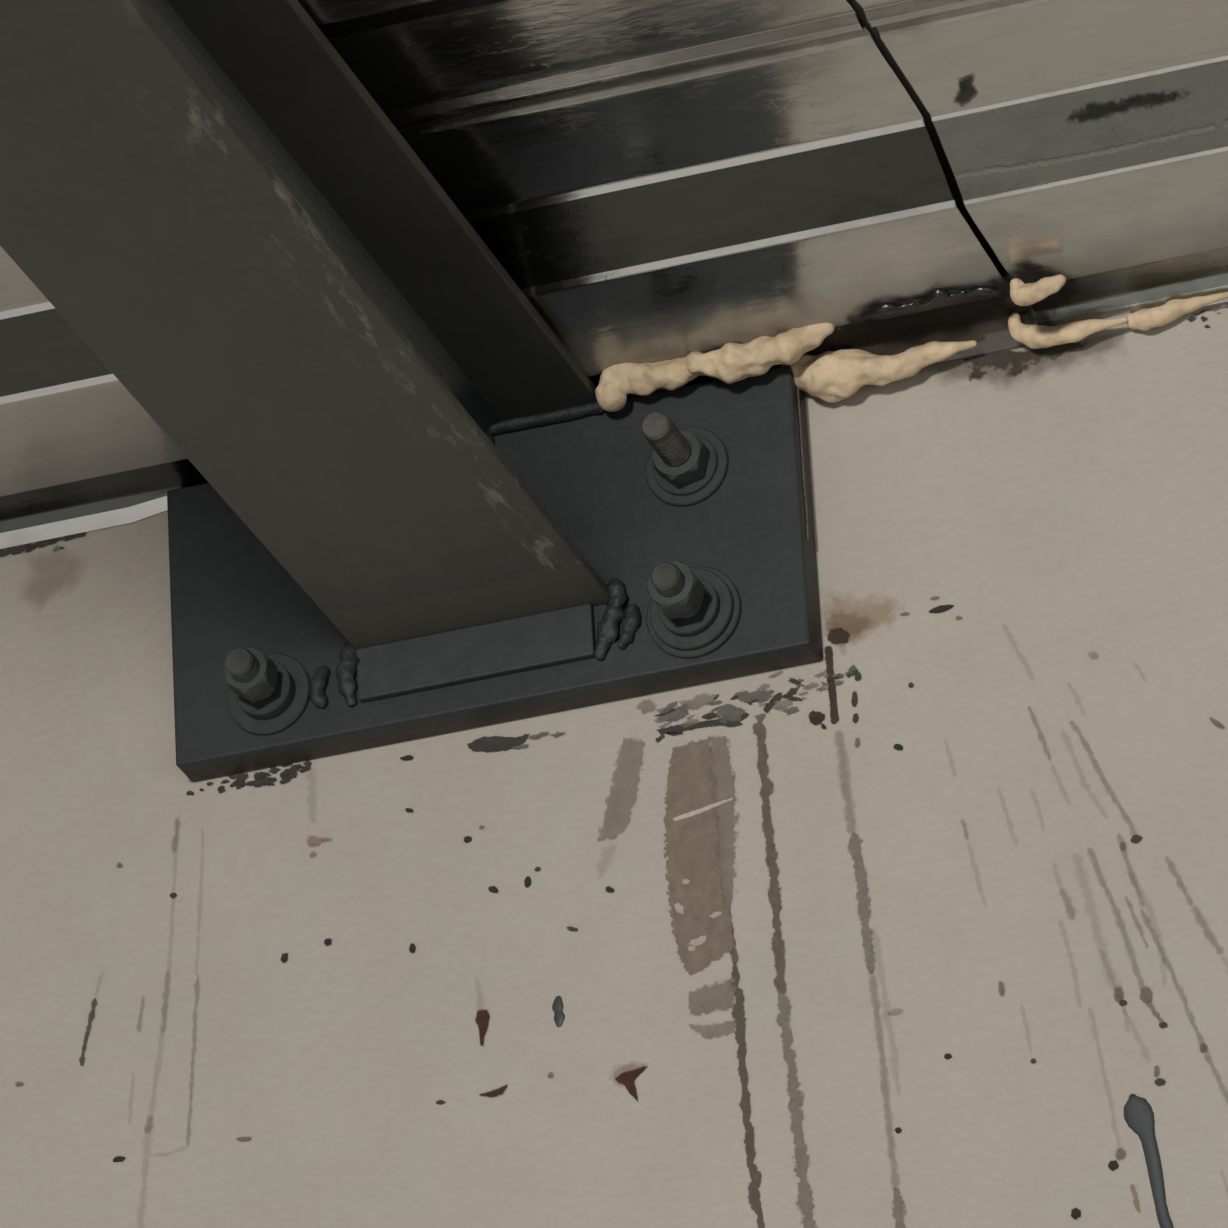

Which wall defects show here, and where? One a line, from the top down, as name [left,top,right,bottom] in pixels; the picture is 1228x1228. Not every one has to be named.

rust [828,627,850,644]
peeling [637,665,858,742]
leakage [597,738,644,841]
leakage [1120,834,1142,851]
leakage [848,833,875,973]
leakage [664,736,765,1228]
leakage [753,722,818,1228]
leakage [1114,987,1167,1028]
leakage [1154,1066,1166,1086]
leakage [892,1187,906,1228]